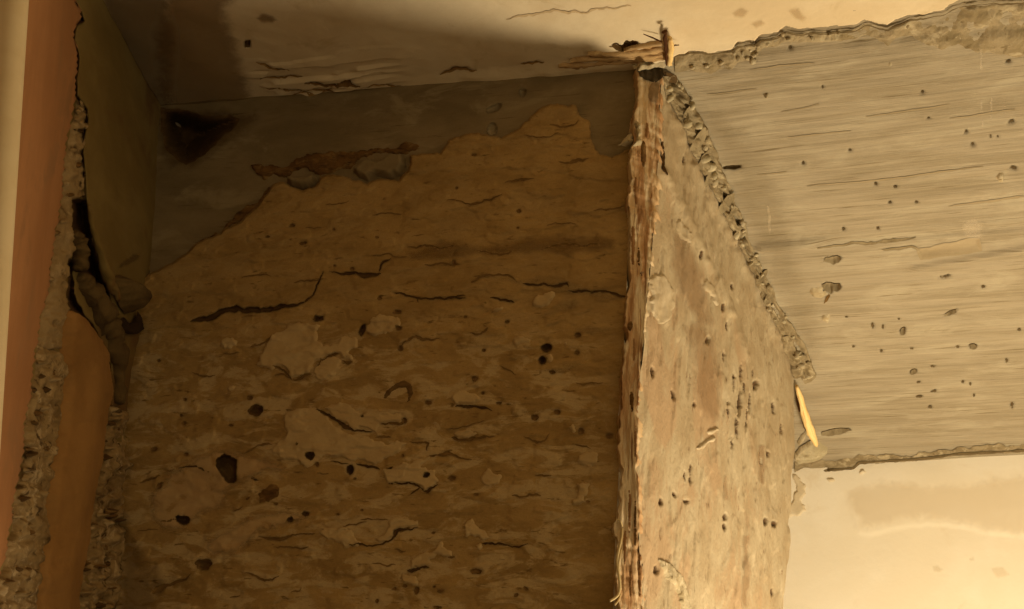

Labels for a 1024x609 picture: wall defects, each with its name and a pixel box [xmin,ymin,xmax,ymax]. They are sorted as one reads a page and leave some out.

crack [506,5,630,20]
spalling [675,2,1024,74]
crack [559,157,589,165]
spalling [0,99,89,609]
crack [190,244,626,381]
spalling [149,61,677,609]
peeling [702,279,727,329]
crack [512,474,552,498]
spalling [789,443,1024,518]
crack [230,572,301,599]